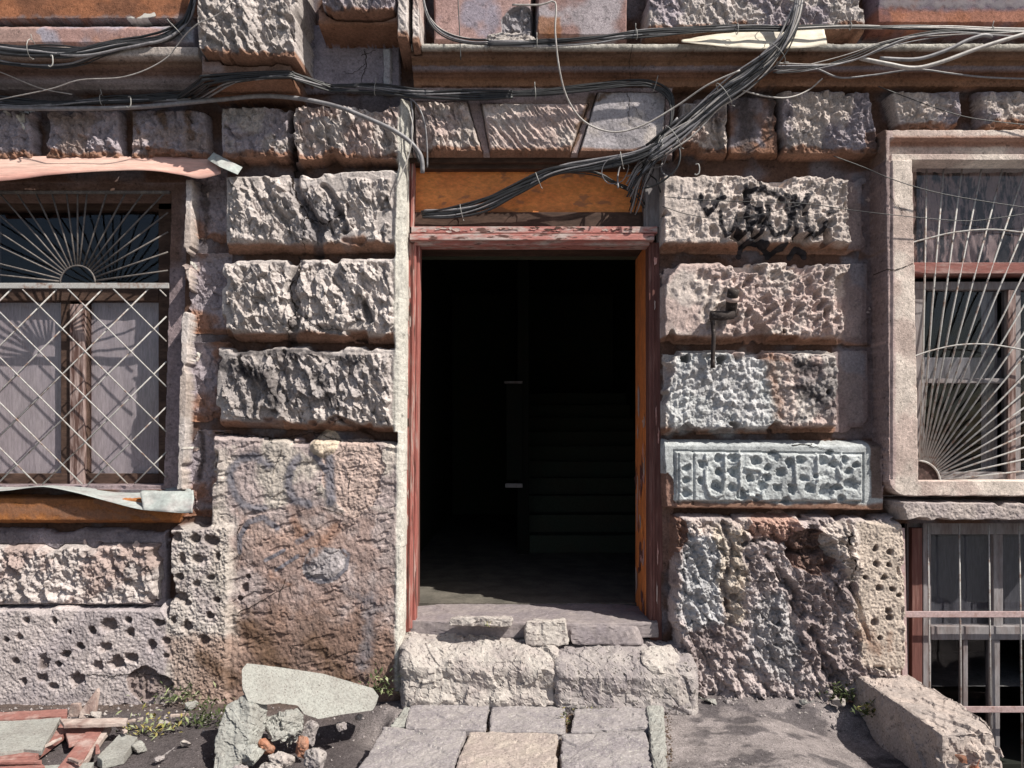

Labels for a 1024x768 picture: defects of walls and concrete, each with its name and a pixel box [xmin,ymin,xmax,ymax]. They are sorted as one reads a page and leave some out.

spalling [634,389,690,614]
spalling [747,508,838,576]
spalling [126,665,175,703]